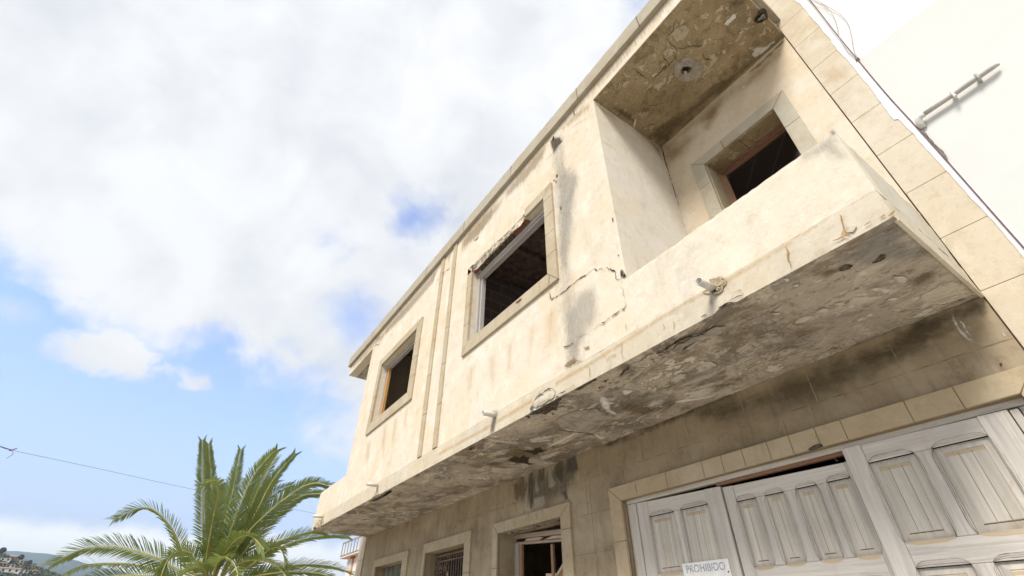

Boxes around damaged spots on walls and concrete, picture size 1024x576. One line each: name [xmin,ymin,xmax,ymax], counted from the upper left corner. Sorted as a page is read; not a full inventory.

spalling [754,8,768,23]
crack [632,21,710,108]
peeling [752,36,775,57]
leakage [558,176,575,247]
leakage [565,295,591,367]
crack [548,267,629,376]
peeling [632,314,726,364]
flaking render [703,276,744,310]
peeling [794,276,970,324]
spalling [527,379,597,418]
peeling [469,435,562,459]
leakage [487,448,577,518]